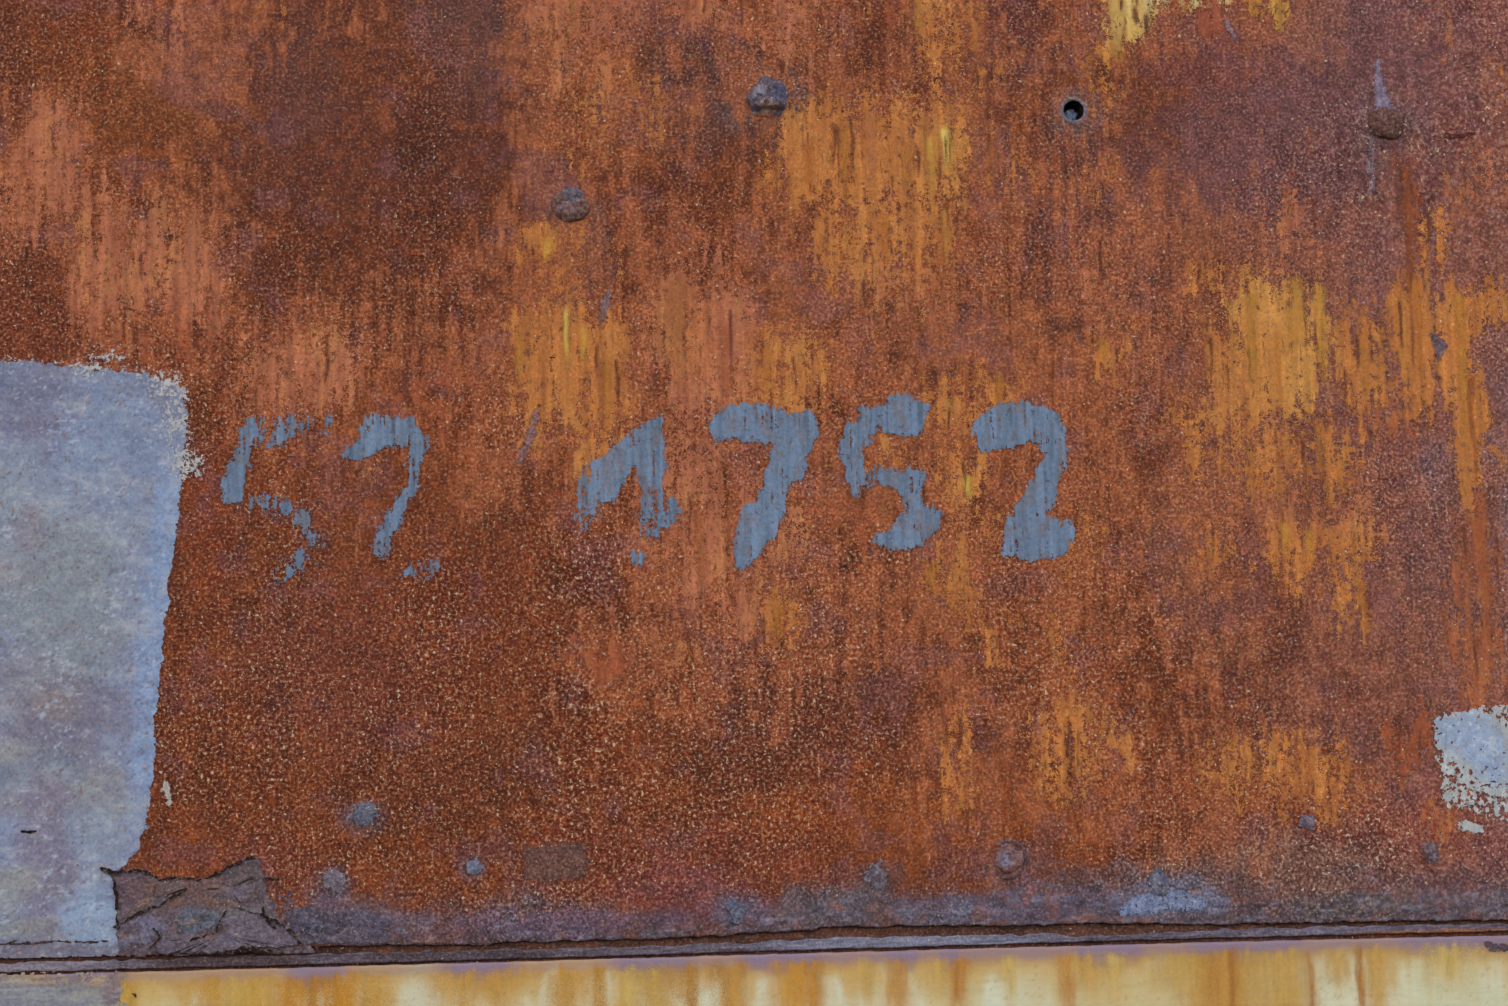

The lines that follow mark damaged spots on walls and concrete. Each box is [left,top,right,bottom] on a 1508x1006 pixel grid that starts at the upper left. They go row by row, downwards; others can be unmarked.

rust [0,0,1141,837]
rust [1056,139,1508,719]
rust [1185,705,1372,845]
rust [1372,690,1434,794]
rust [1411,788,1473,865]
rust [100,855,404,957]
rust [523,961,638,1006]
rust [1300,943,1399,1006]
peeling [1485,941,1508,952]